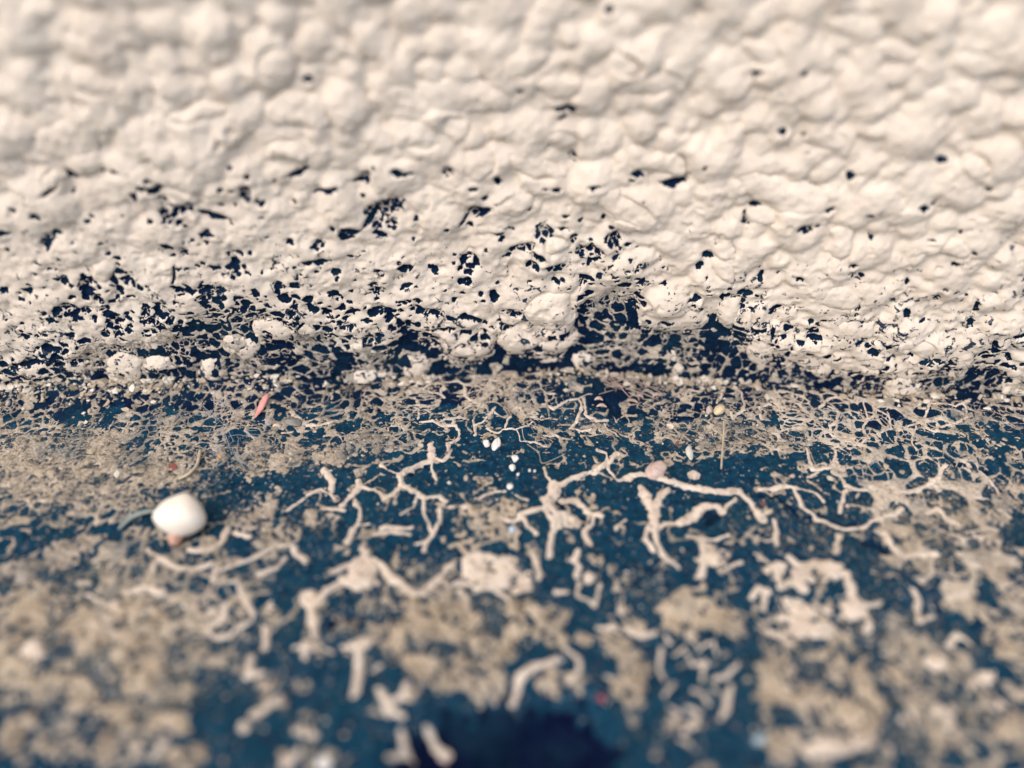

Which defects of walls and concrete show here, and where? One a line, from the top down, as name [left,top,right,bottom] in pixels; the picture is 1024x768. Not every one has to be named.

peeling [0,165,1024,768]